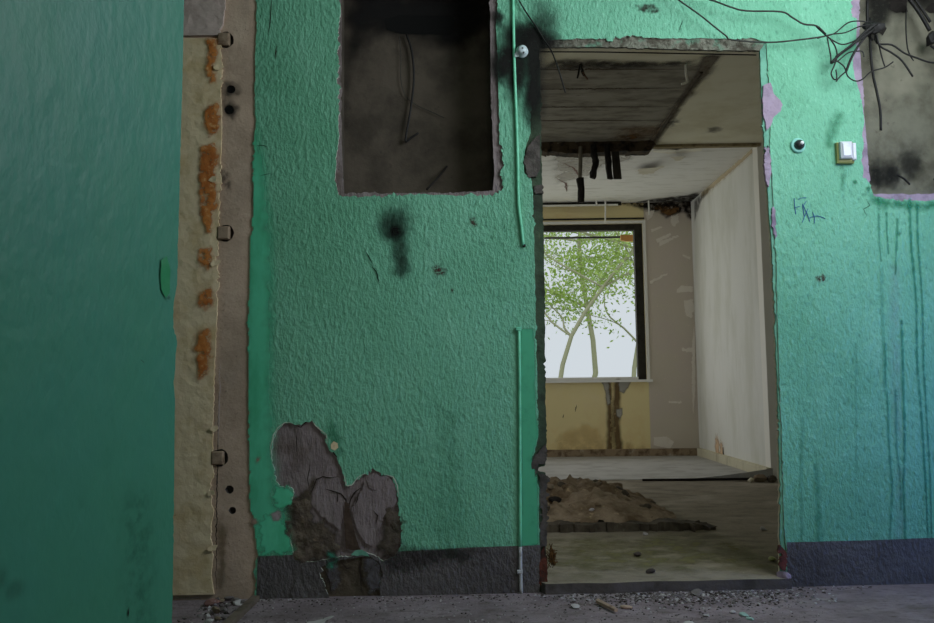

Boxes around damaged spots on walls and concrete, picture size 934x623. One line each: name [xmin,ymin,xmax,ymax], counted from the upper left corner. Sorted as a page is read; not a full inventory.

flaking render [763,145,772,187]
flaking render [761,82,783,131]
damp [867,187,934,535]
flaking render [259,421,403,597]